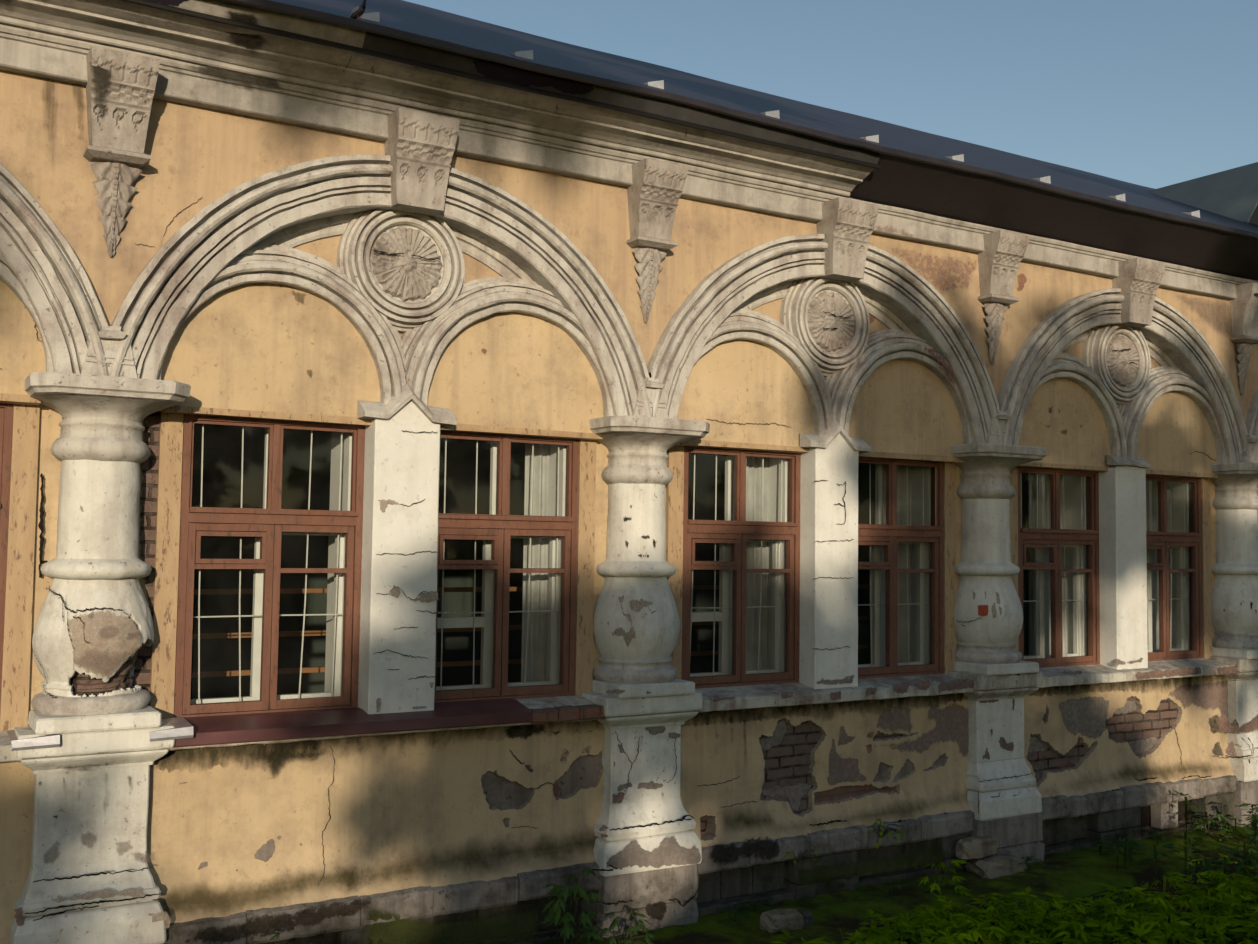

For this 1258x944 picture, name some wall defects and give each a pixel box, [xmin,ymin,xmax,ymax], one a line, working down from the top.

flaking render [123,411,161,621]
flaking render [67,611,152,706]
peeling [255,836,281,862]
crack [318,747,335,886]
leakage [371,836,598,879]
flaking render [481,764,535,828]
flaking render [553,744,625,800]
peeling [612,781,663,804]
peeling [607,815,716,870]
flaking render [759,679,1015,817]
flaking render [983,658,1258,788]
leakage [163,870,356,913]